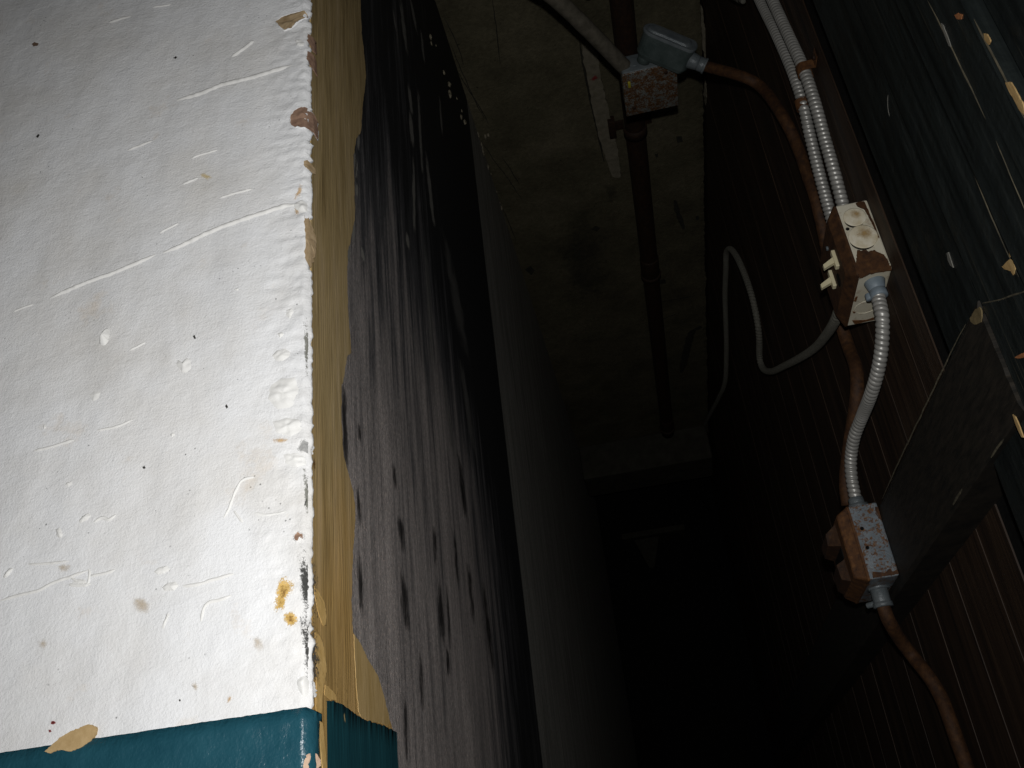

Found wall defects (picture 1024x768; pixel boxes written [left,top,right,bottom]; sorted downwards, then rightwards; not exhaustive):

peeling [275,10,318,77]
peeling [289,106,319,141]
peeling [294,200,317,268]
peeling [297,586,389,768]
peeling [45,724,98,754]